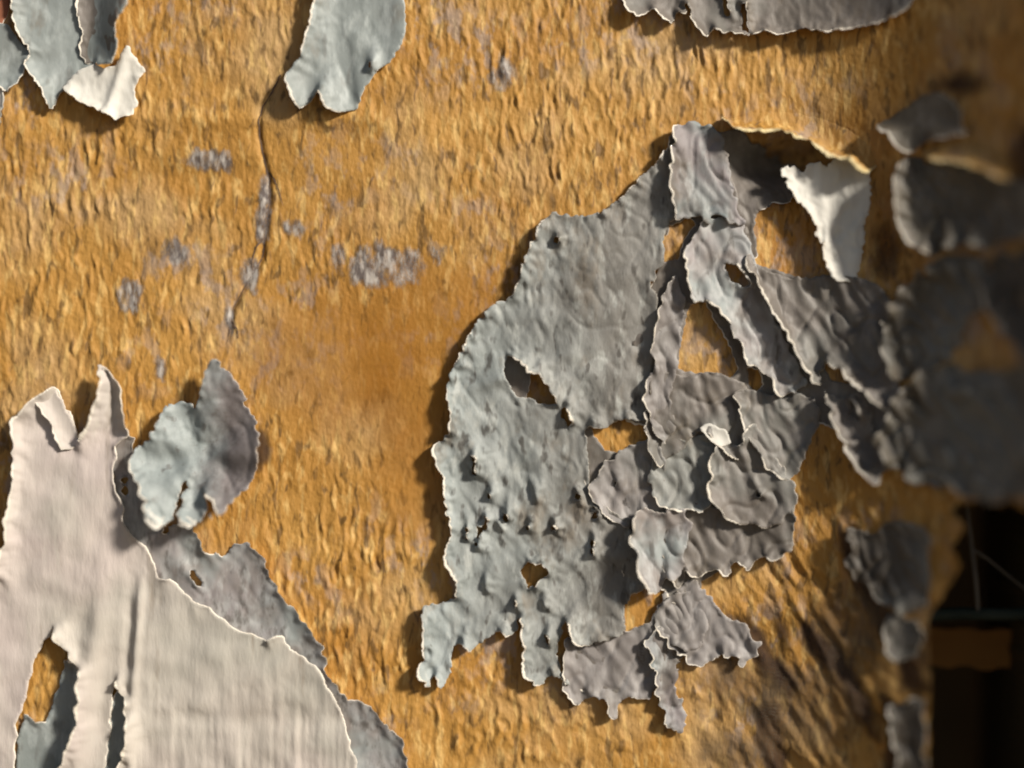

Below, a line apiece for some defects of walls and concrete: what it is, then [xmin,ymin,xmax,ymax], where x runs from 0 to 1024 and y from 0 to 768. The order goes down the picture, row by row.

peeling [0,0,145,124]
peeling [284,0,407,112]
crack [227,75,283,343]
peeling [417,92,1024,734]
peeling [0,359,357,768]